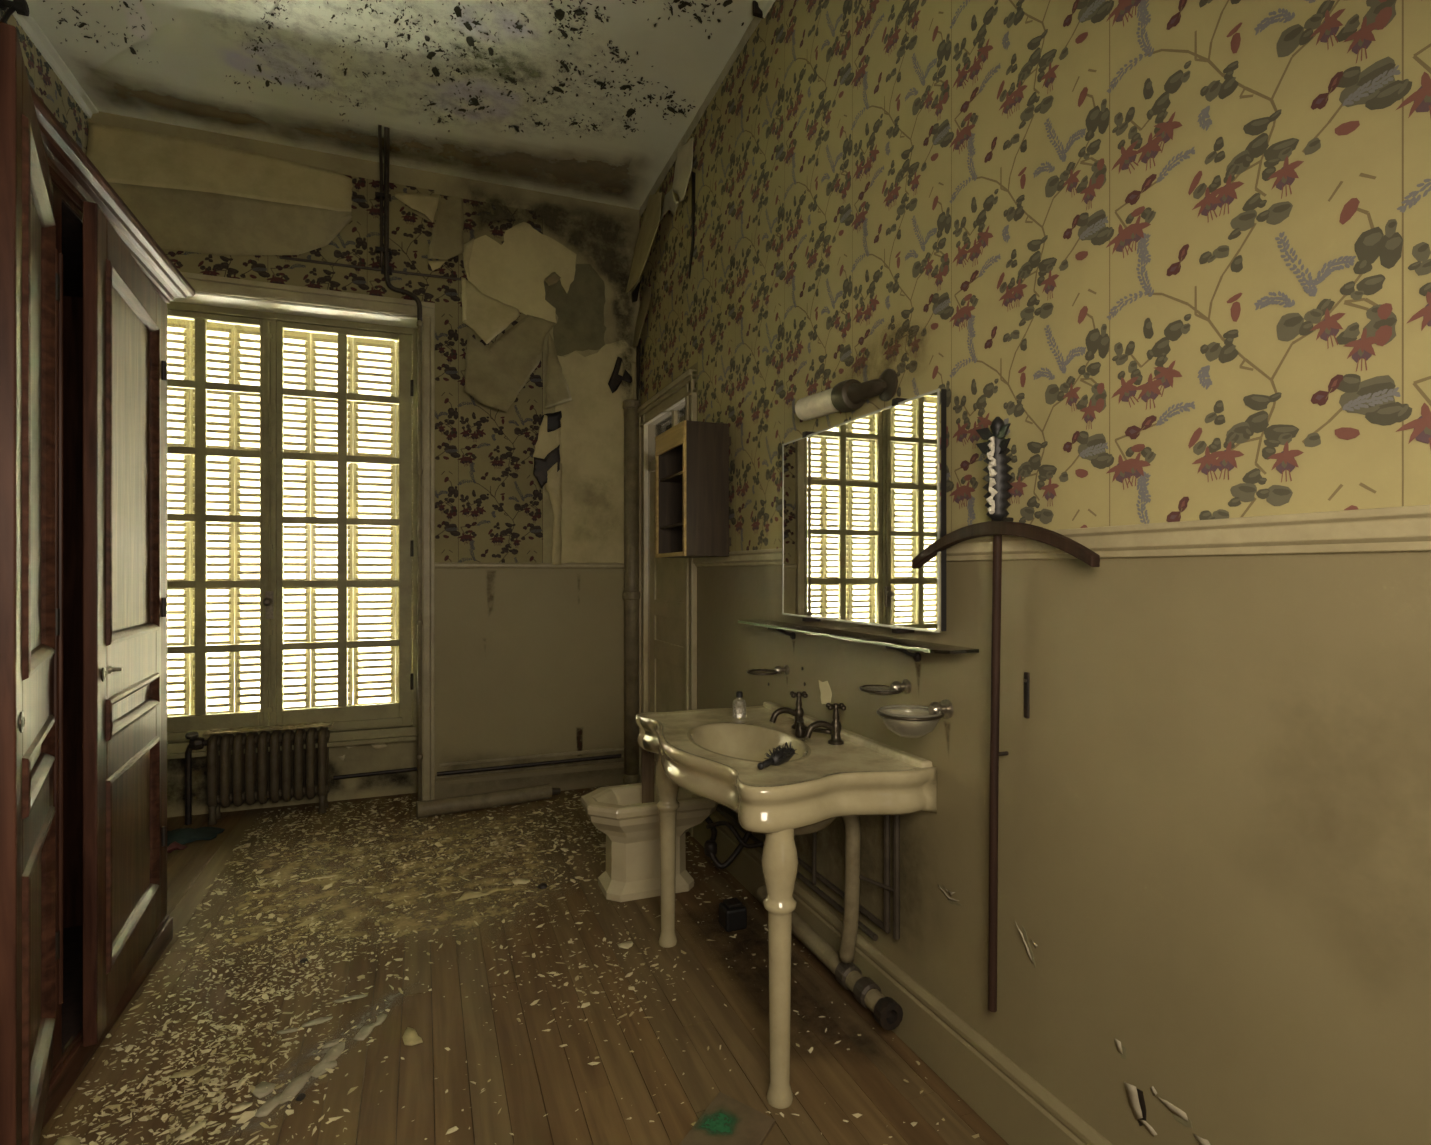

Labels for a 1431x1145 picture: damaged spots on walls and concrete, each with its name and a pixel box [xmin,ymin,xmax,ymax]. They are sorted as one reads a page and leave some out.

leakage [107,0,633,195]
flaking render [463,222,577,323]
flaking render [555,340,636,563]
spalling [1124,1082,1210,1145]